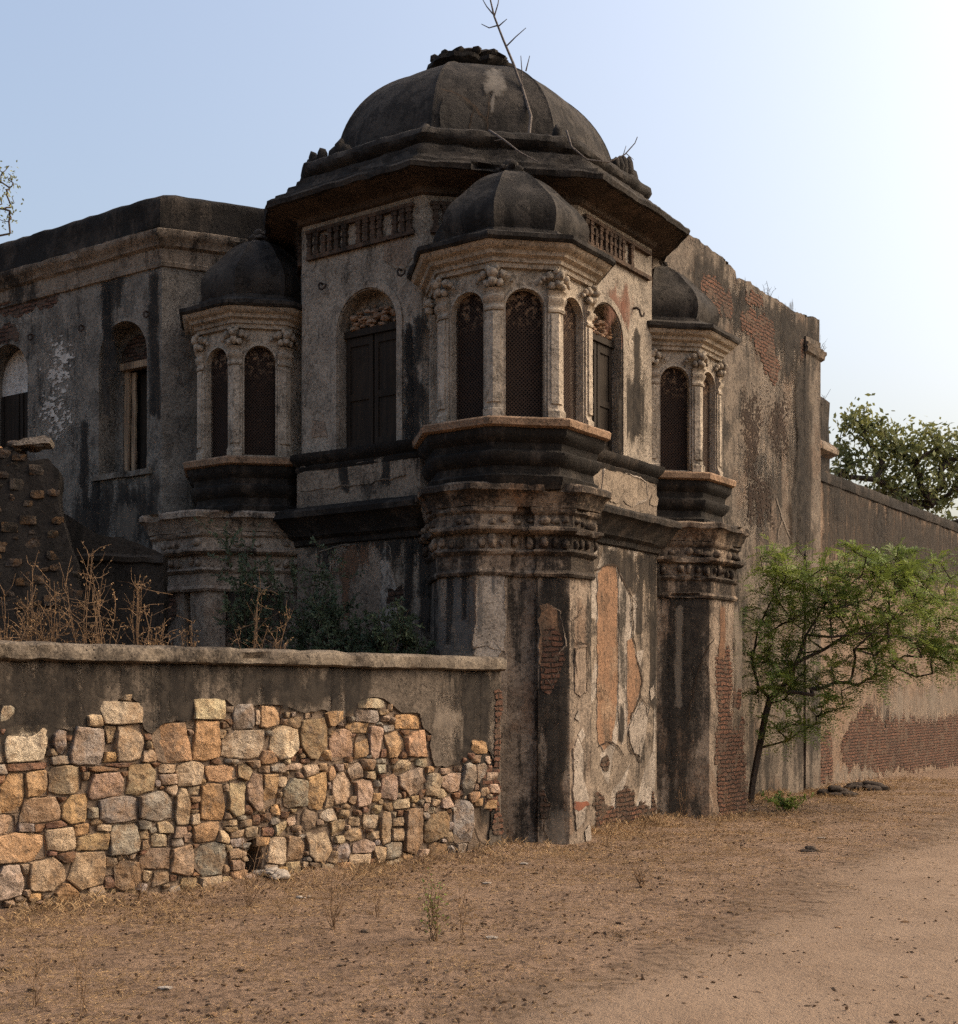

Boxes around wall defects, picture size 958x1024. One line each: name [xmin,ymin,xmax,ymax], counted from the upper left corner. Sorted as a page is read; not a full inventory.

peeling [39,335,75,440]
water stain [102,277,123,417]
water stain [72,420,160,548]
water stain [148,271,160,419]
water stain [403,315,427,440]
flaking render [700,273,805,534]
water stain [692,251,958,592]
peeling [537,603,567,695]
water stain [537,577,570,822]
peeling [571,566,657,842]
flaking render [715,606,750,816]
flaking render [821,703,958,784]